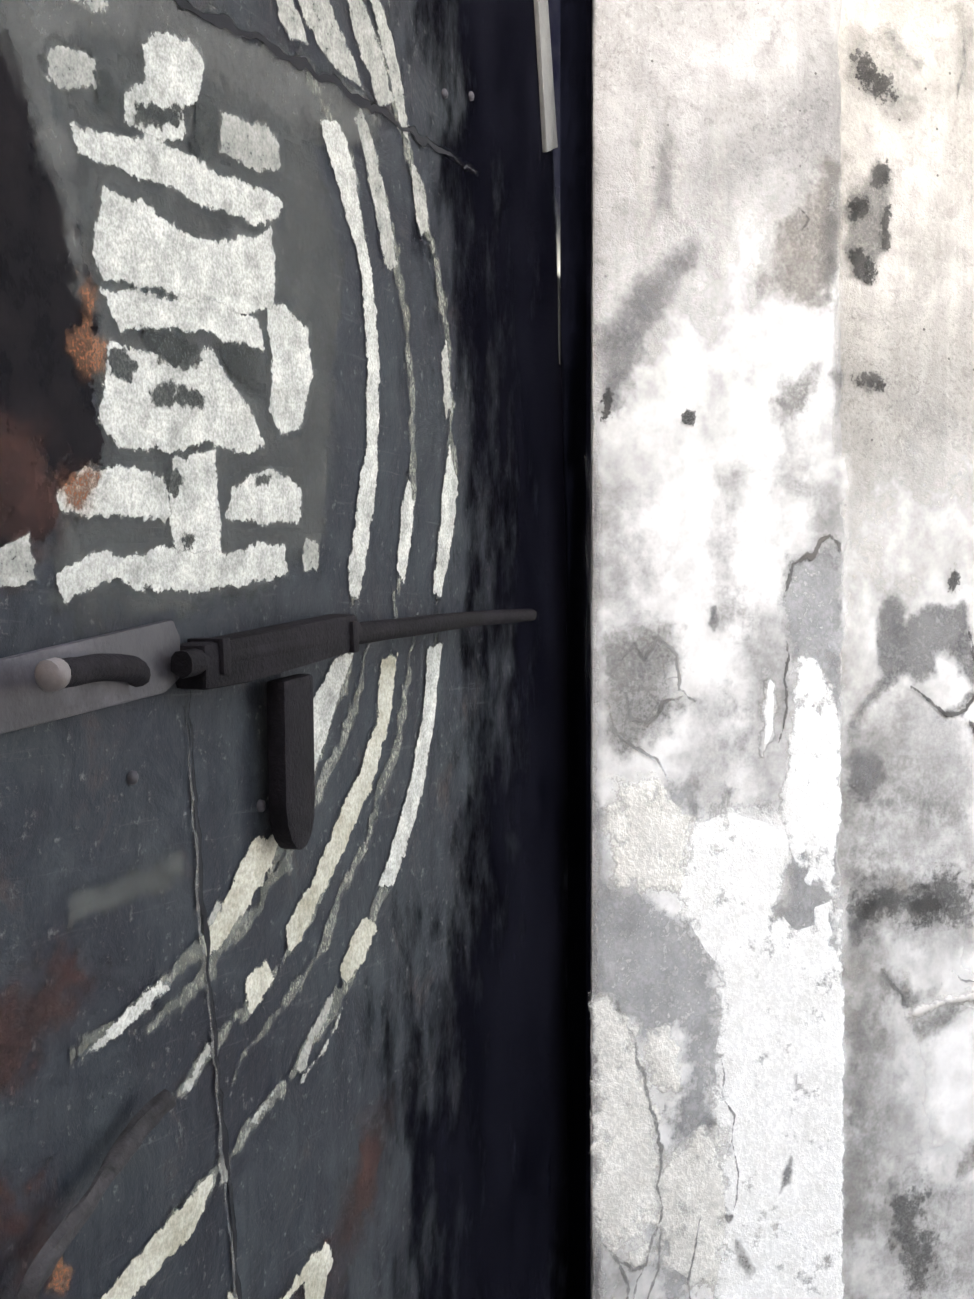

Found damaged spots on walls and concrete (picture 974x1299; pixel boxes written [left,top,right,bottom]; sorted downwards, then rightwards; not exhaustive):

damp [776,159,892,306]
rust [65,272,107,378]
rust [0,418,101,551]
damp [850,569,974,733]
crack [596,1008,701,1299]
crack [722,1063,739,1208]
rust [48,1256,70,1295]